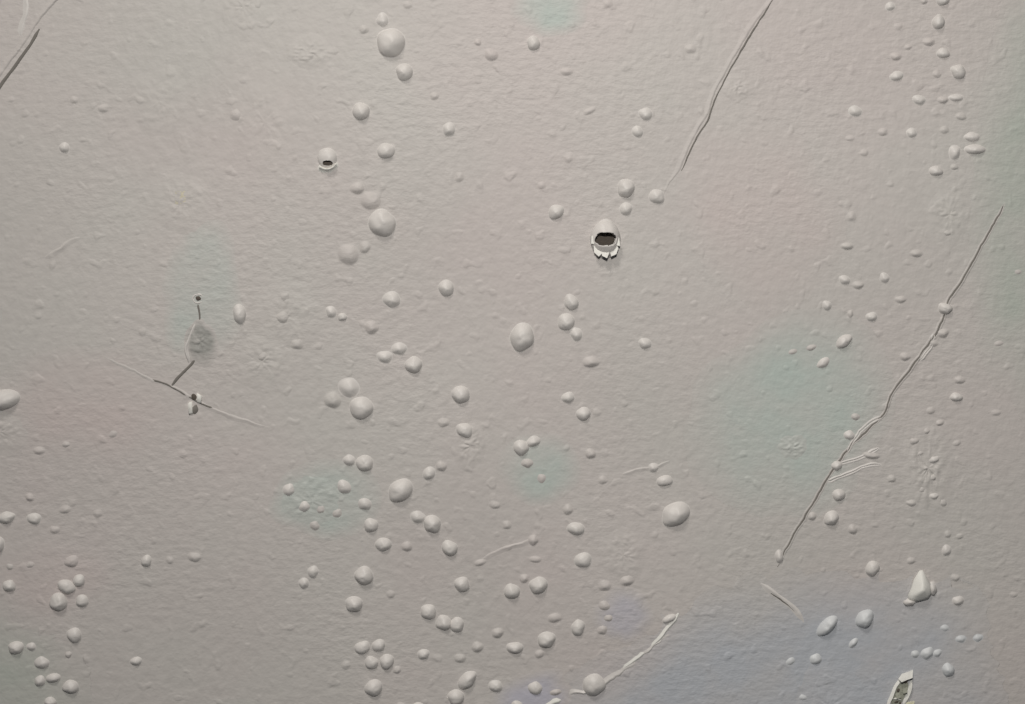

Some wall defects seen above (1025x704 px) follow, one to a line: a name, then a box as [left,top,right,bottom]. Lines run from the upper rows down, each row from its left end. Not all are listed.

crack [0,0,58,89]
crack [663,0,773,194]
crack [760,203,1005,622]
peeling [903,570,937,606]
spalling [887,670,915,704]